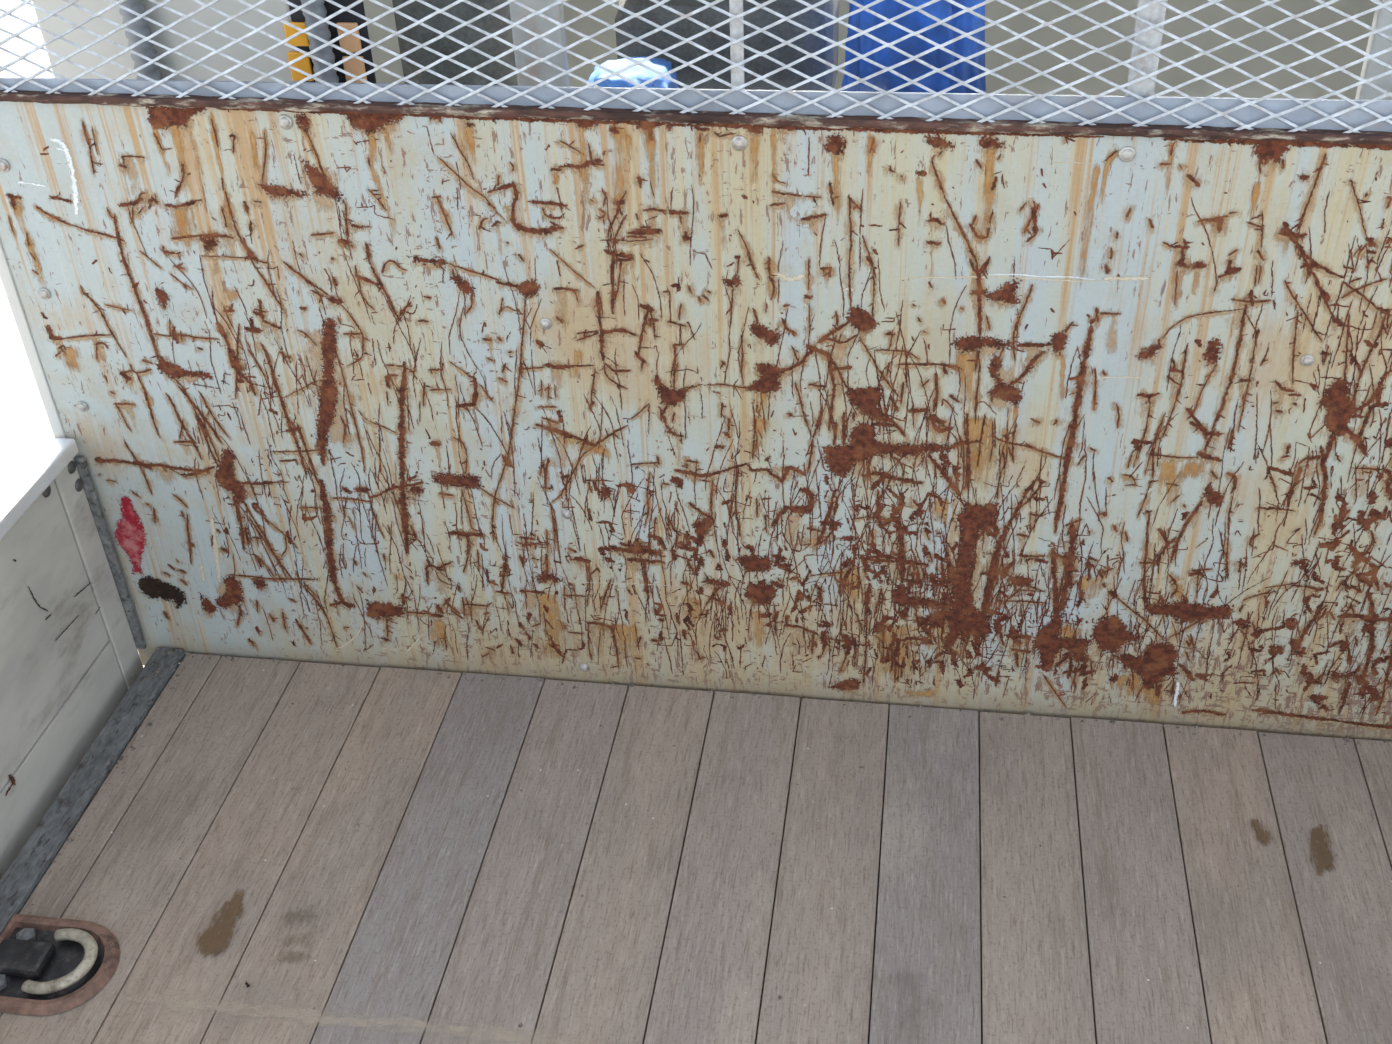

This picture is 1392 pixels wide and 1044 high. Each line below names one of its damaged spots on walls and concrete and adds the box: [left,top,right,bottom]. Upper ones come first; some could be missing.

rust [55,345,79,371]
rust [104,99,1392,723]
damp [1310,824,1334,876]
damp [195,889,244,957]